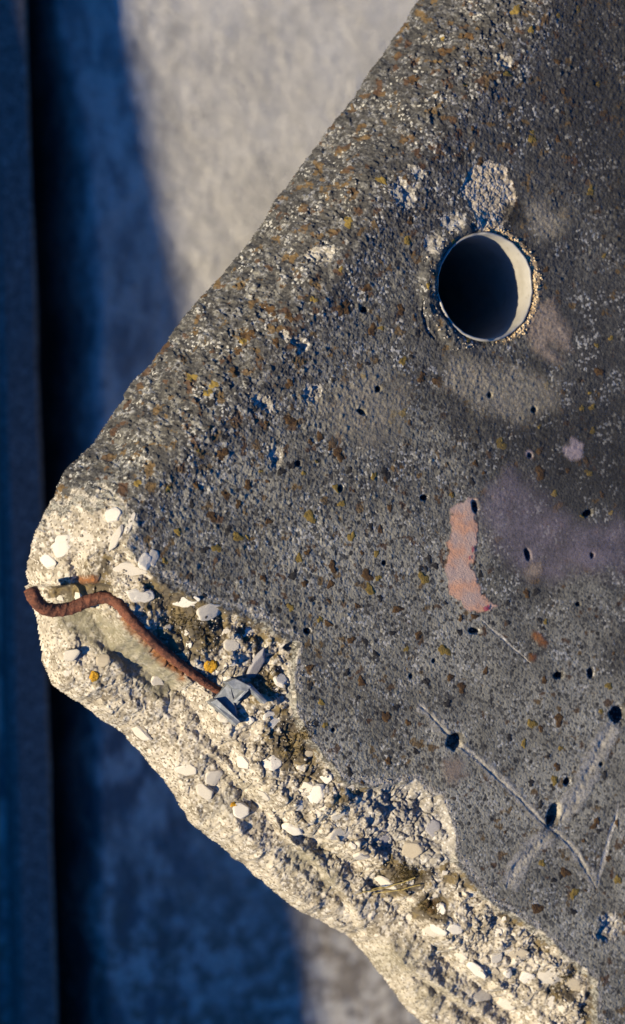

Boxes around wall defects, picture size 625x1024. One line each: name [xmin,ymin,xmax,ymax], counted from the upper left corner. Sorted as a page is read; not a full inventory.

rust [121,617,184,680]
spalling [24,490,607,1024]